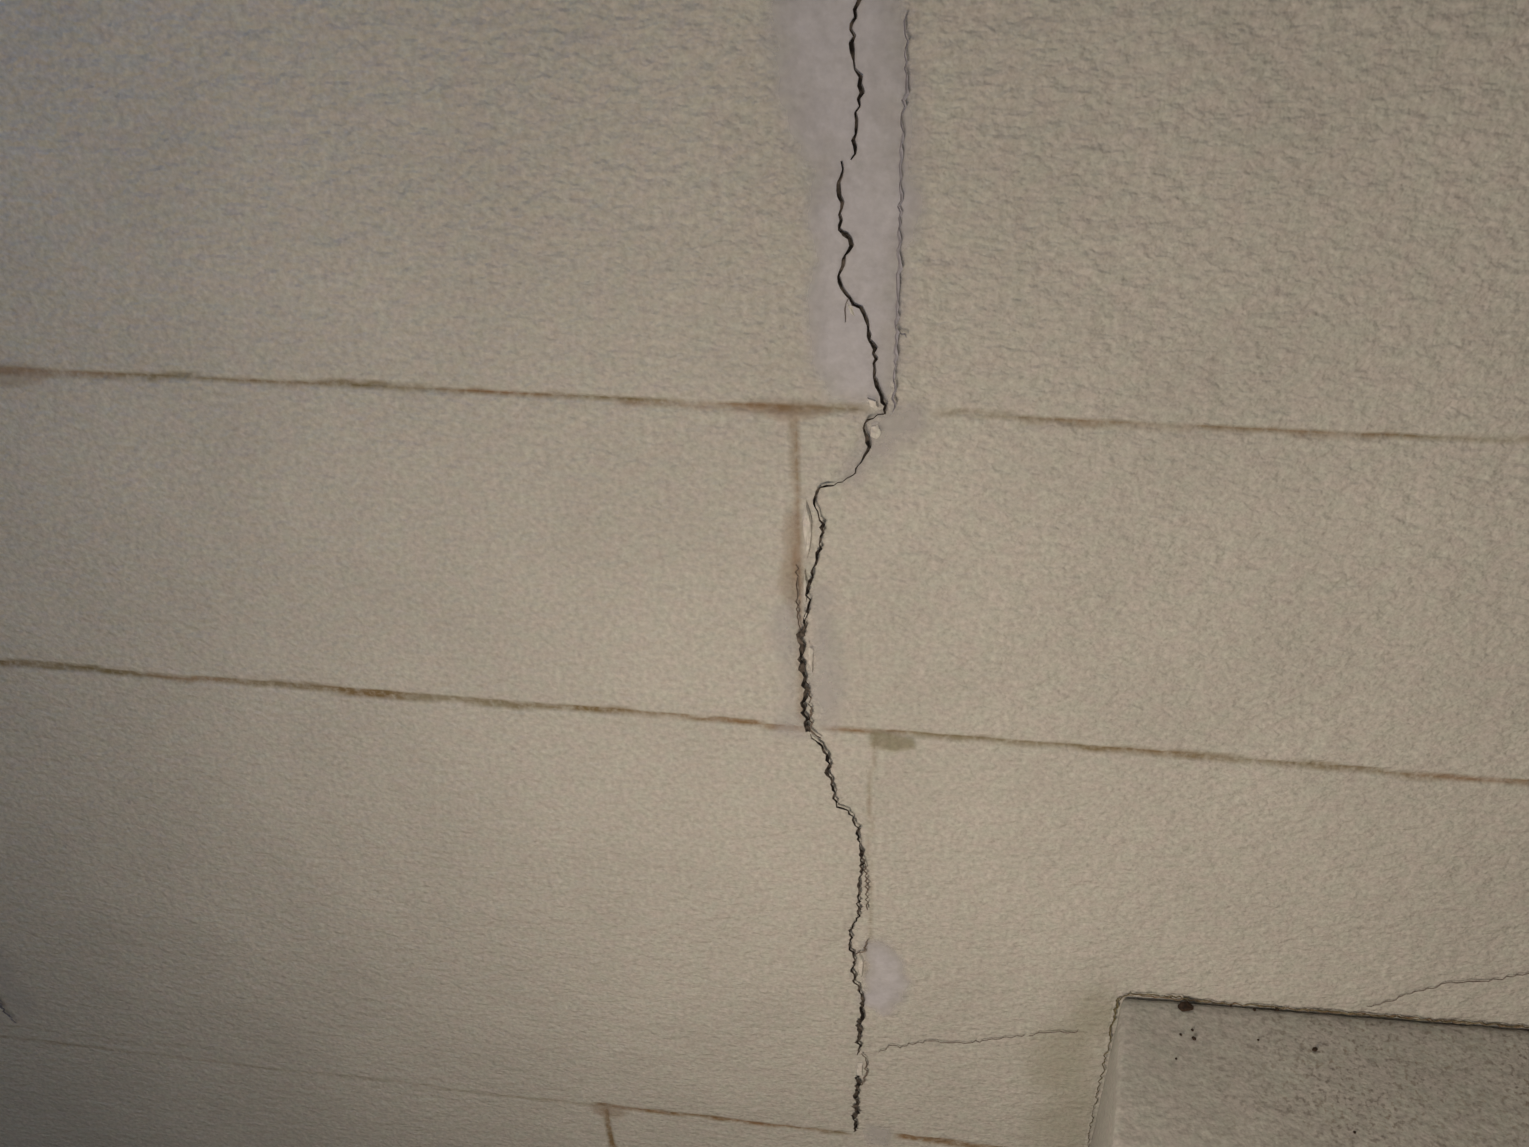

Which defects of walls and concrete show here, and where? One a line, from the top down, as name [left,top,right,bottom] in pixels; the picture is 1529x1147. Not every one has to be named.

crack [795,0,1078,1132]